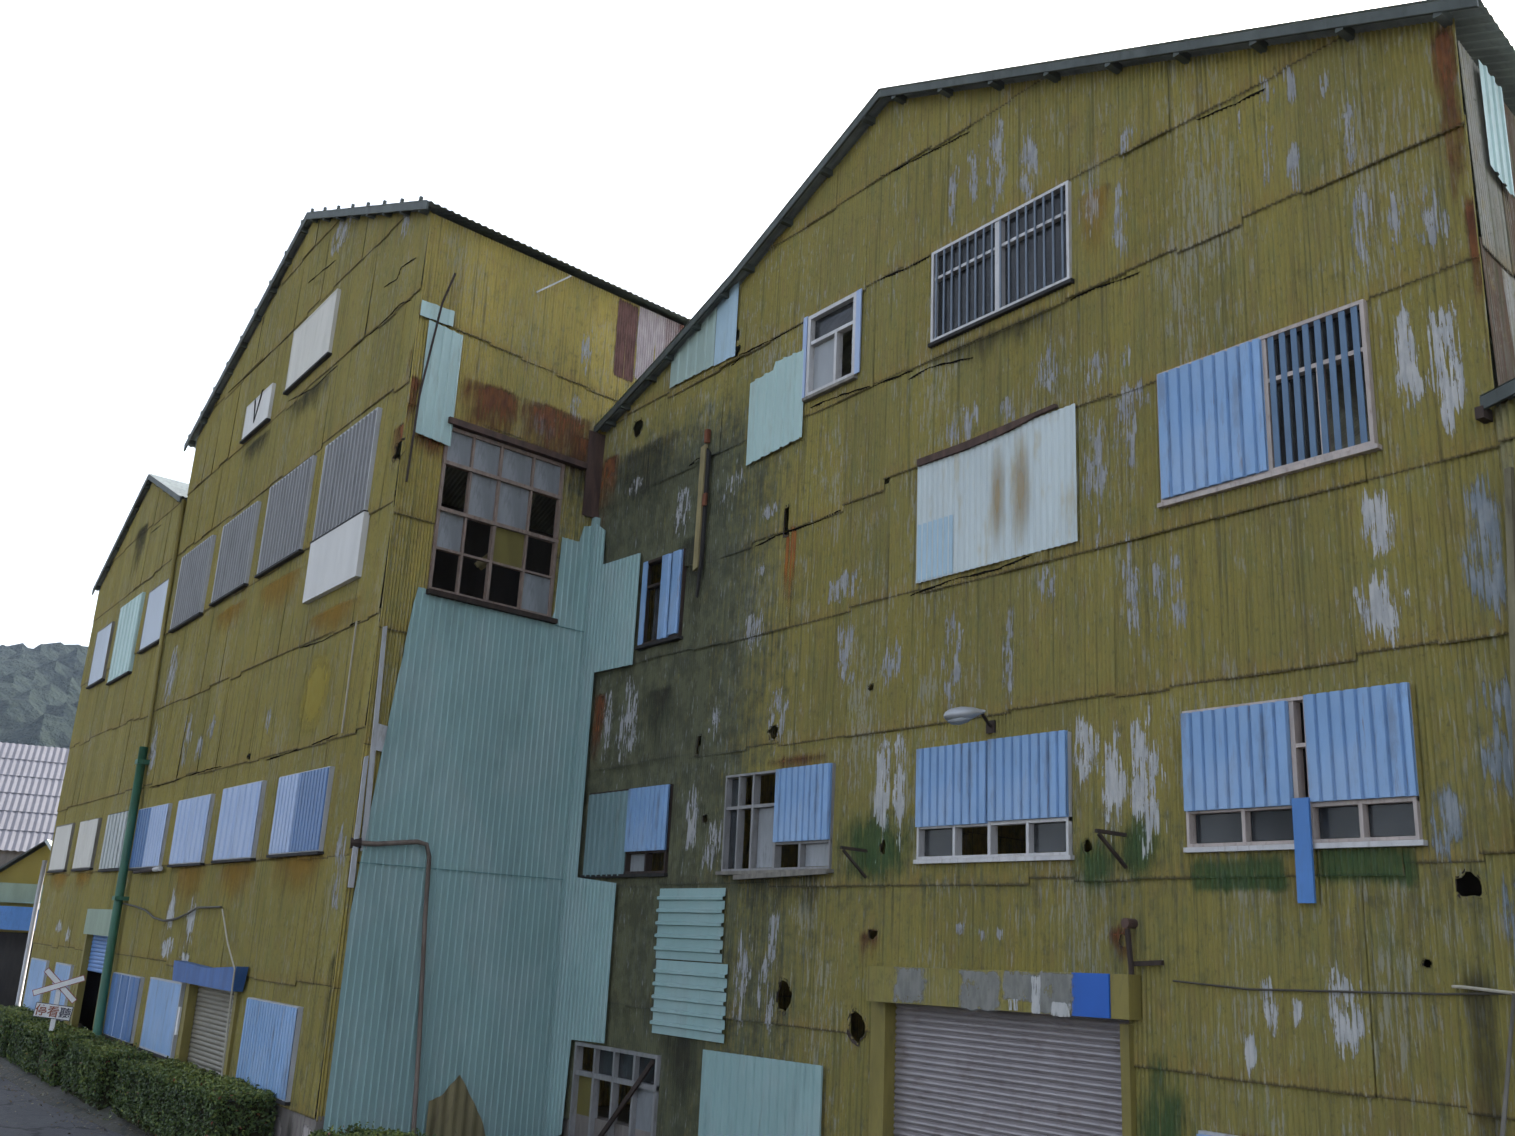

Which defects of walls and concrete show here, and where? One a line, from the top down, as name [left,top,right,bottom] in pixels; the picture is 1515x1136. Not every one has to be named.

corrosion [1432,27,1461,170]
corrosion [1465,199,1483,289]
corrosion [464,381,589,461]
peeling [1394,290,1468,439]
peeling [1349,487,1410,649]
peeling [599,675,639,789]
peeling [874,733,906,852]
peeling [1074,705,1167,860]
peeling [732,899,782,1035]
peeling [1243,976,1303,1080]
peeling [1324,960,1370,1062]